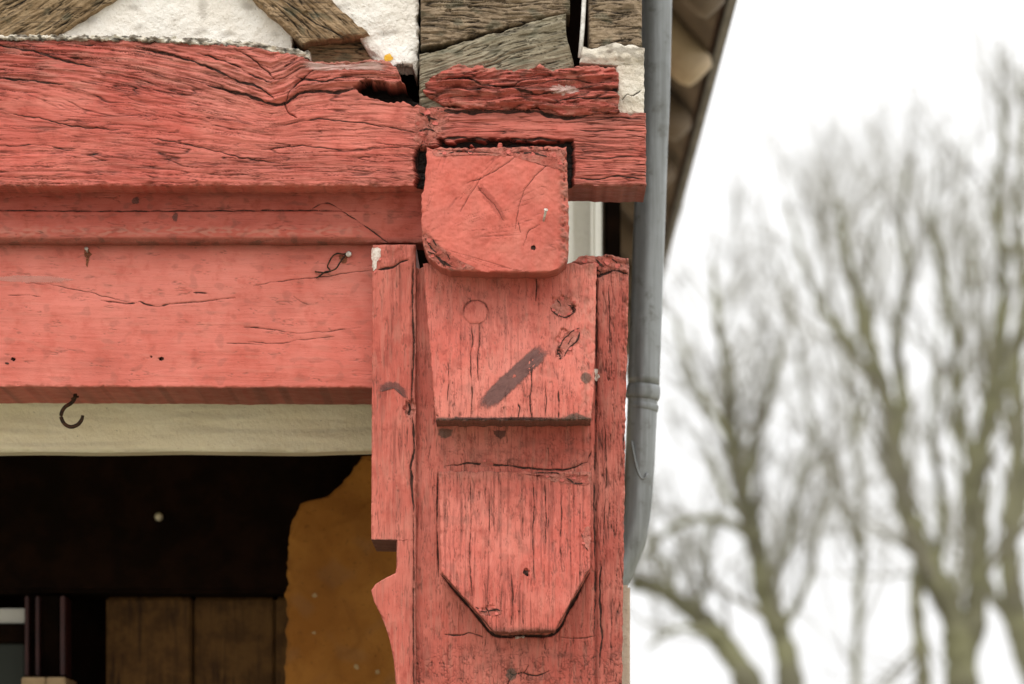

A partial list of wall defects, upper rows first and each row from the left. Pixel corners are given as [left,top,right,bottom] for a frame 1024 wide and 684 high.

crack [0,44,644,243]
crack [0,203,415,684]
crack [448,424,607,621]